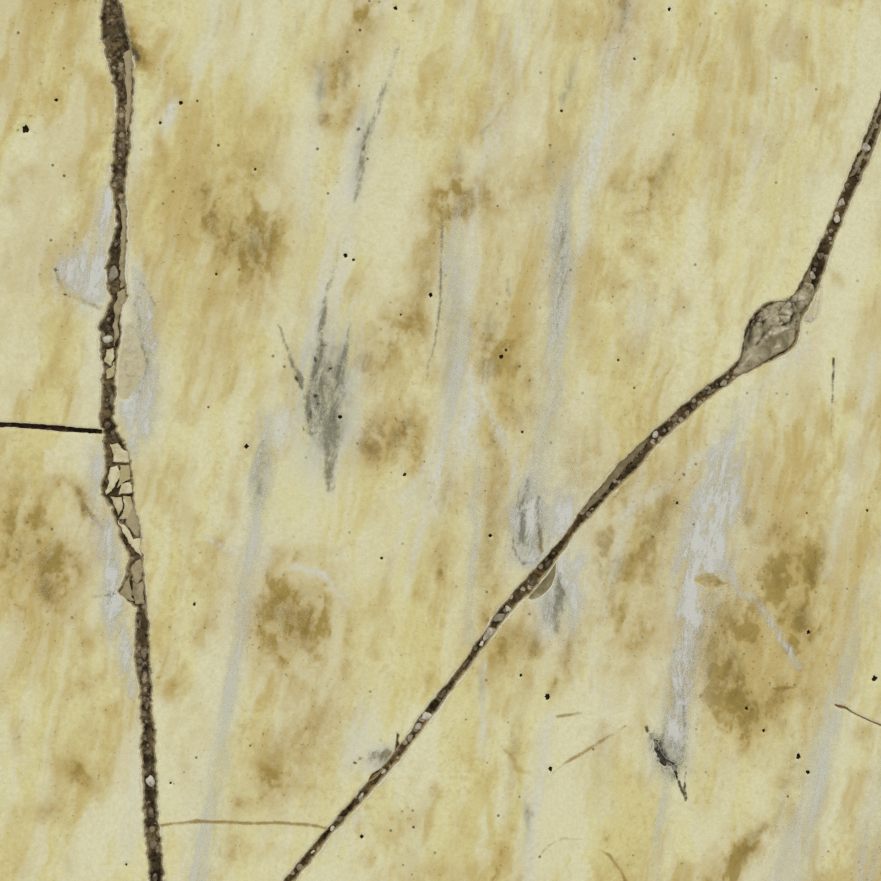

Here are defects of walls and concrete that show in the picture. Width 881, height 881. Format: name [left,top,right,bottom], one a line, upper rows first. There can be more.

crack [0,0,167,881]
peeling [90,454,103,498]
peeling [98,516,135,697]
crack [281,90,881,881]
leakage [664,422,801,757]